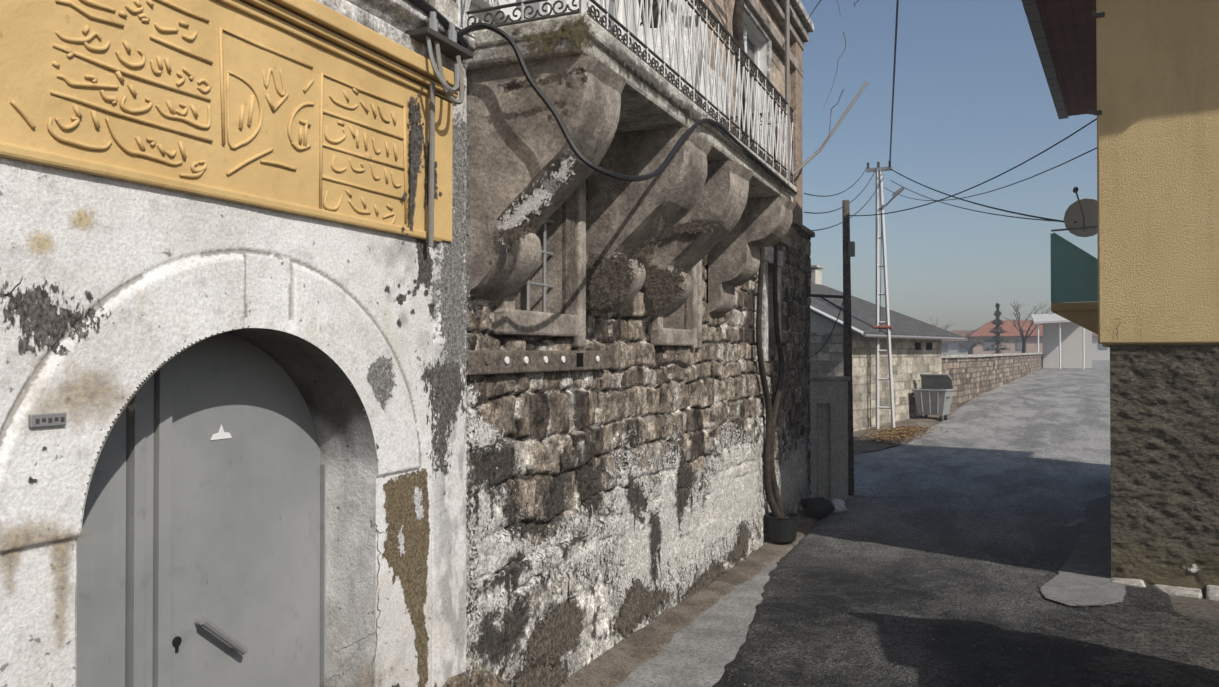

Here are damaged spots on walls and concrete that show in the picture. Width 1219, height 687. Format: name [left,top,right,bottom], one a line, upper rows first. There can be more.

peeling [0,277,111,355]
flaking render [367,355,397,411]
peeling [382,92,474,687]
damp [466,435,605,671]
damp [620,473,665,609]
damp [675,455,695,539]